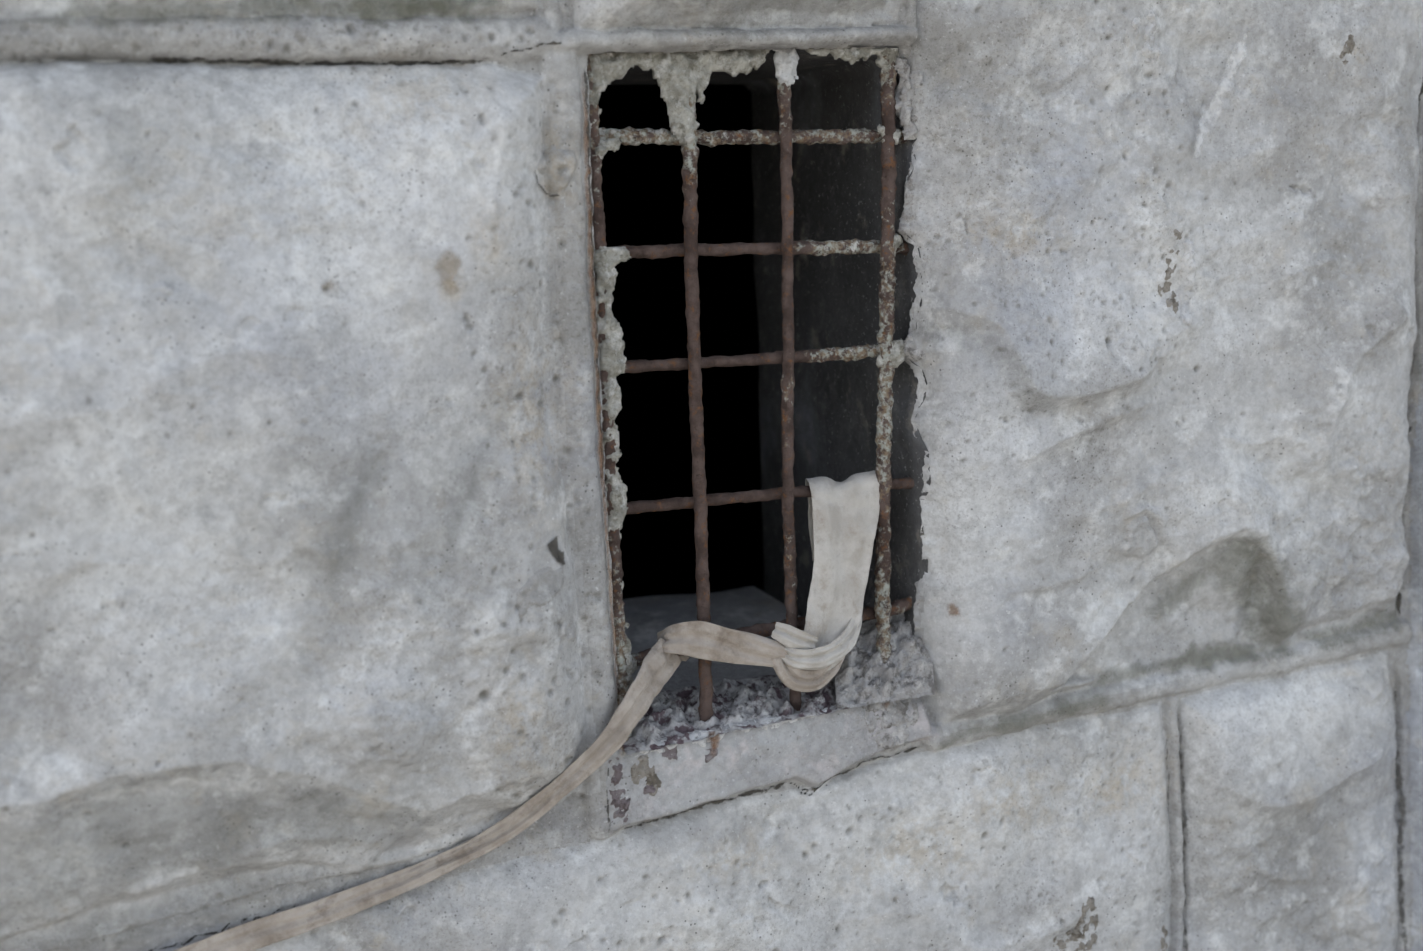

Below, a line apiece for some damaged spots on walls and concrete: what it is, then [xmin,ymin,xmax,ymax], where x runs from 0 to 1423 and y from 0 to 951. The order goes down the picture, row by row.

rust [582,91,617,684]